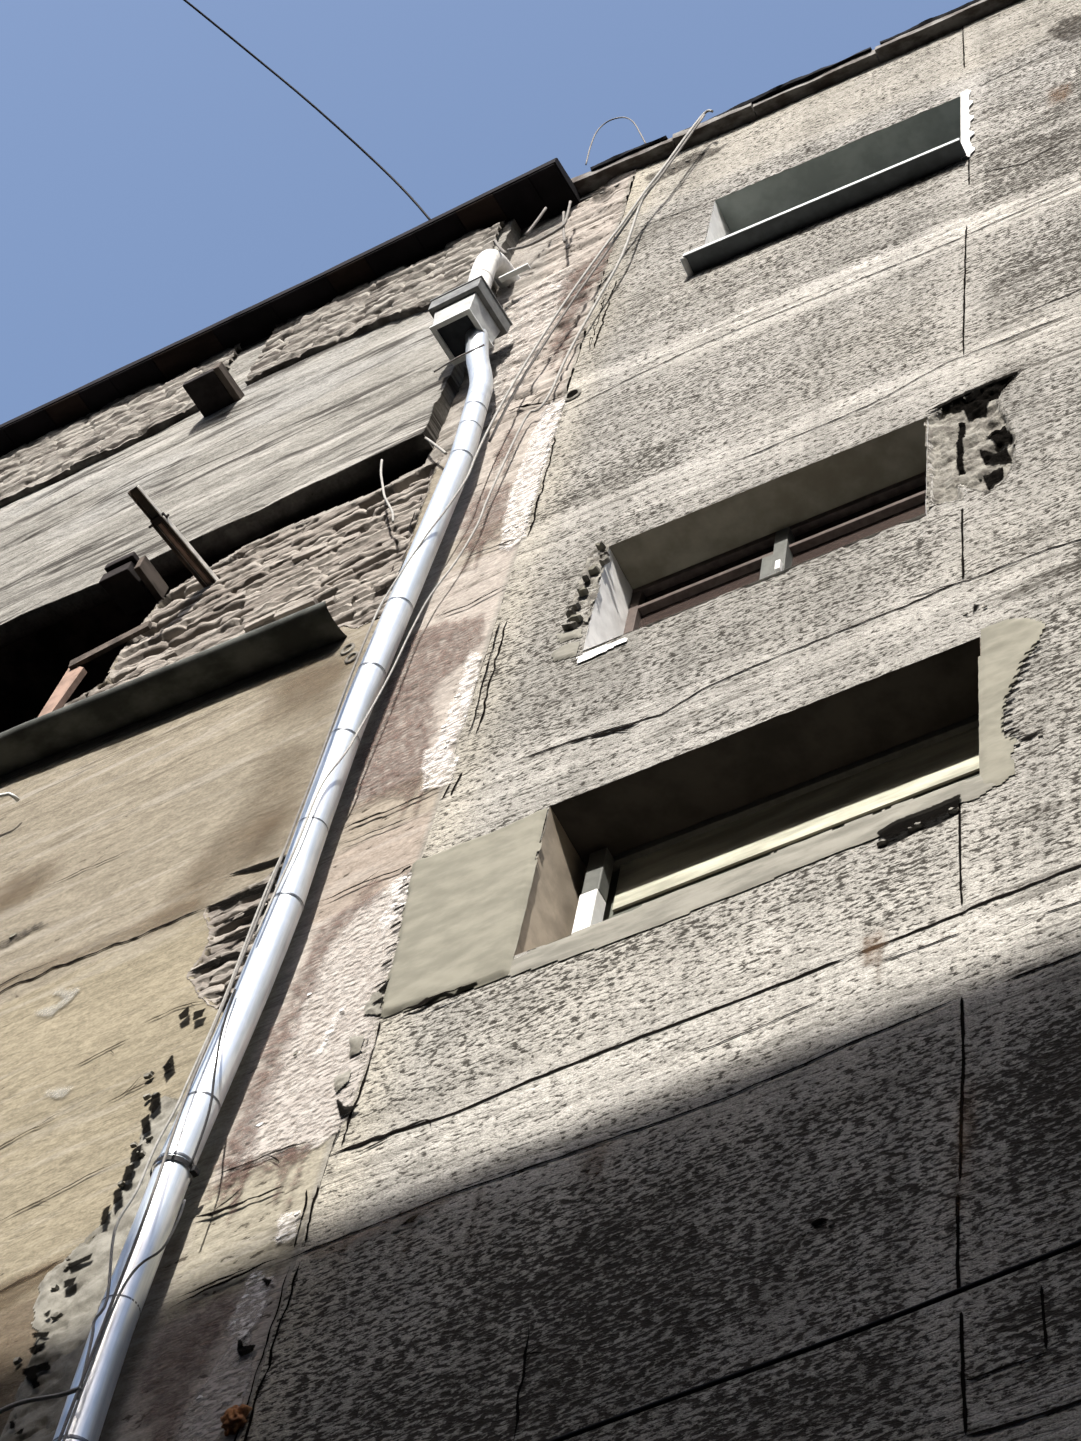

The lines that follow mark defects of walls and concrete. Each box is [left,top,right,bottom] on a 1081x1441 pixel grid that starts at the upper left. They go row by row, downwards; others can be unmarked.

spalling [924,369,1021,507]
spalling [551,542,627,663]
water stain [353,618,484,809]
spalling [179,855,286,1020]
peeling [235,866,412,1169]
spalling [100,1055,174,1226]
spalling [50,1253,92,1291]
peeling [275,1210,301,1242]
spalling [13,1310,64,1389]
peeling [177,1272,273,1441]
crack [514,1324,543,1439]